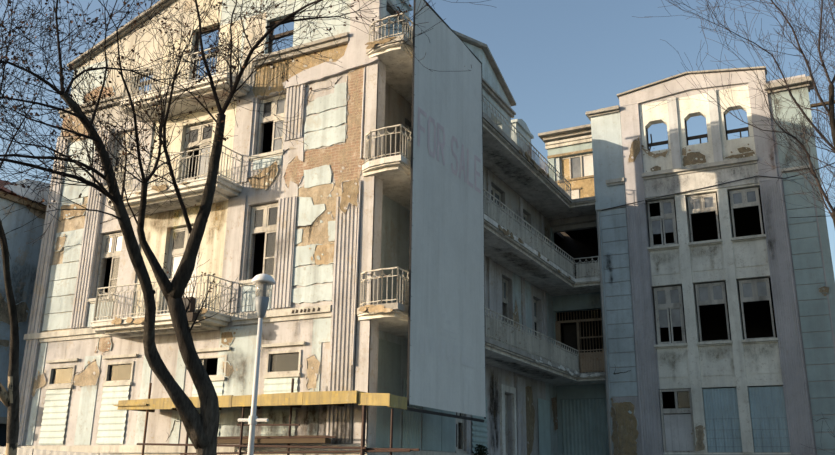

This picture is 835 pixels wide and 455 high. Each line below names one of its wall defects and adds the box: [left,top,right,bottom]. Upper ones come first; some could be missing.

peeling [252,44,348,97]
peeling [248,66,366,266]
peeling [628,137,671,172]
peeling [681,147,706,167]
peeling [724,144,756,159]
peeling [72,337,112,387]
peeling [300,354,320,391]
peeling [525,385,535,455]
peeling [610,398,639,455]